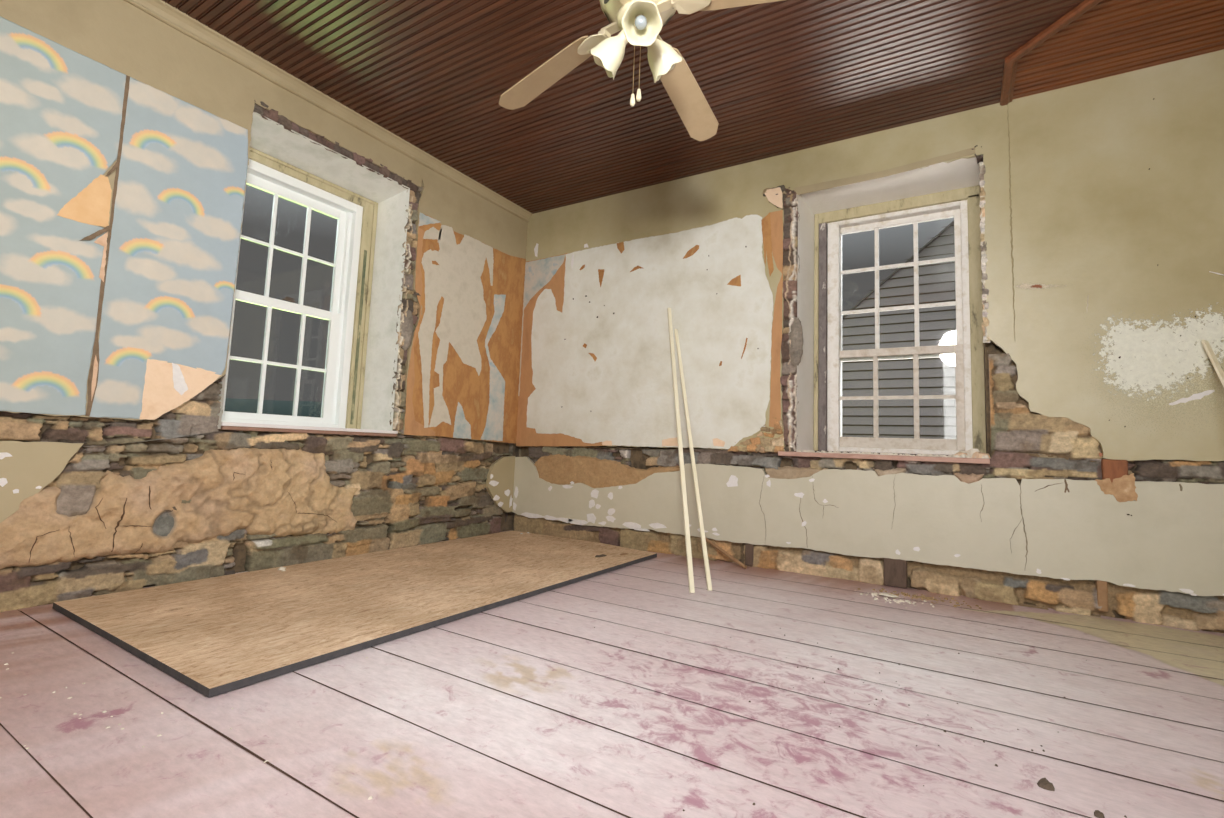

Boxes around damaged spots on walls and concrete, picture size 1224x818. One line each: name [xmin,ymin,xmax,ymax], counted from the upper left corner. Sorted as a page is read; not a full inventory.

flaking render [0,100,1224,633]
crack [1010,479,1069,566]